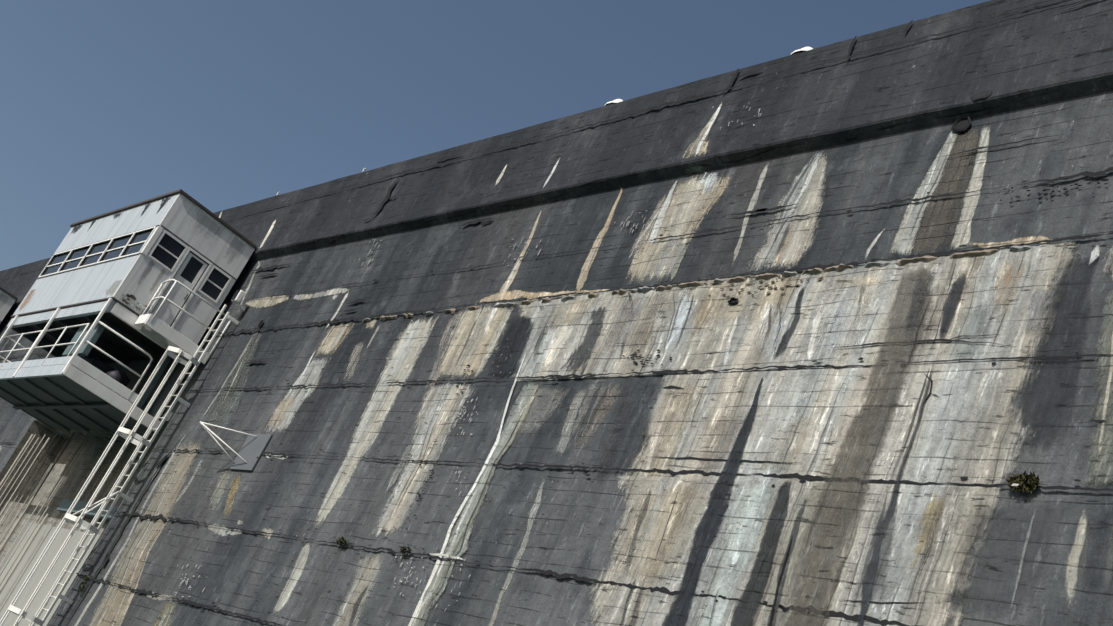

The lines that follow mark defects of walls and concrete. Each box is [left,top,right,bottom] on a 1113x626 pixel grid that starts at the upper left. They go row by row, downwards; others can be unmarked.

leakage [238,220,379,432]
leakage [317,104,1113,626]
leakage [208,520,243,536]
leakage [275,544,310,611]
crack [65,431,1009,626]
crack [1036,479,1113,496]